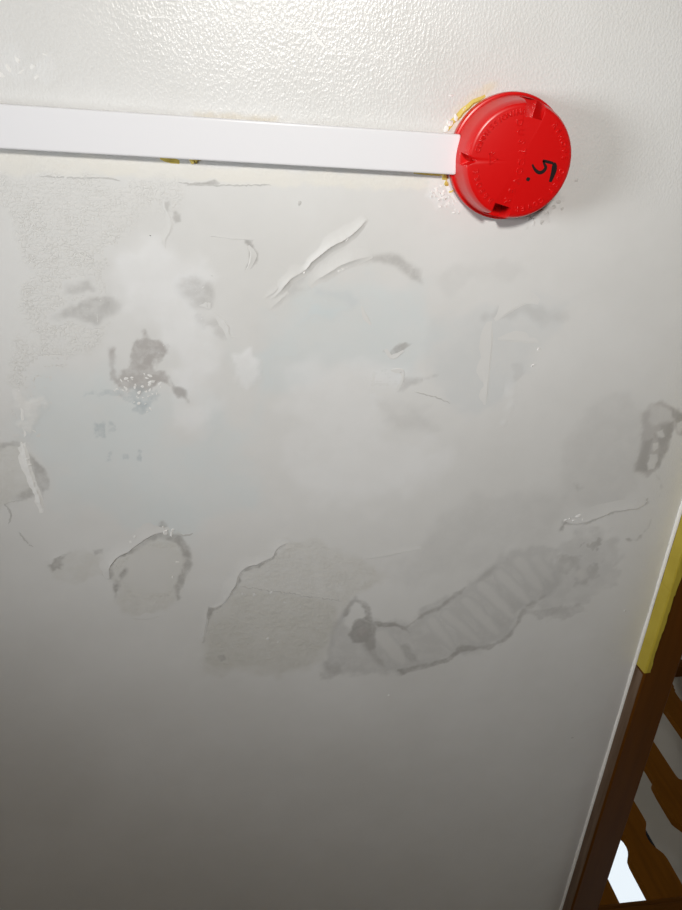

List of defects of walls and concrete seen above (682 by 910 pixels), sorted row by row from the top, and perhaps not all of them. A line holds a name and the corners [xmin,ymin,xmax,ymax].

damp [171,272,239,344]
damp [340,250,542,303]
flaking render [0,430,52,513]
flaking render [99,519,197,624]
damp [316,384,682,684]